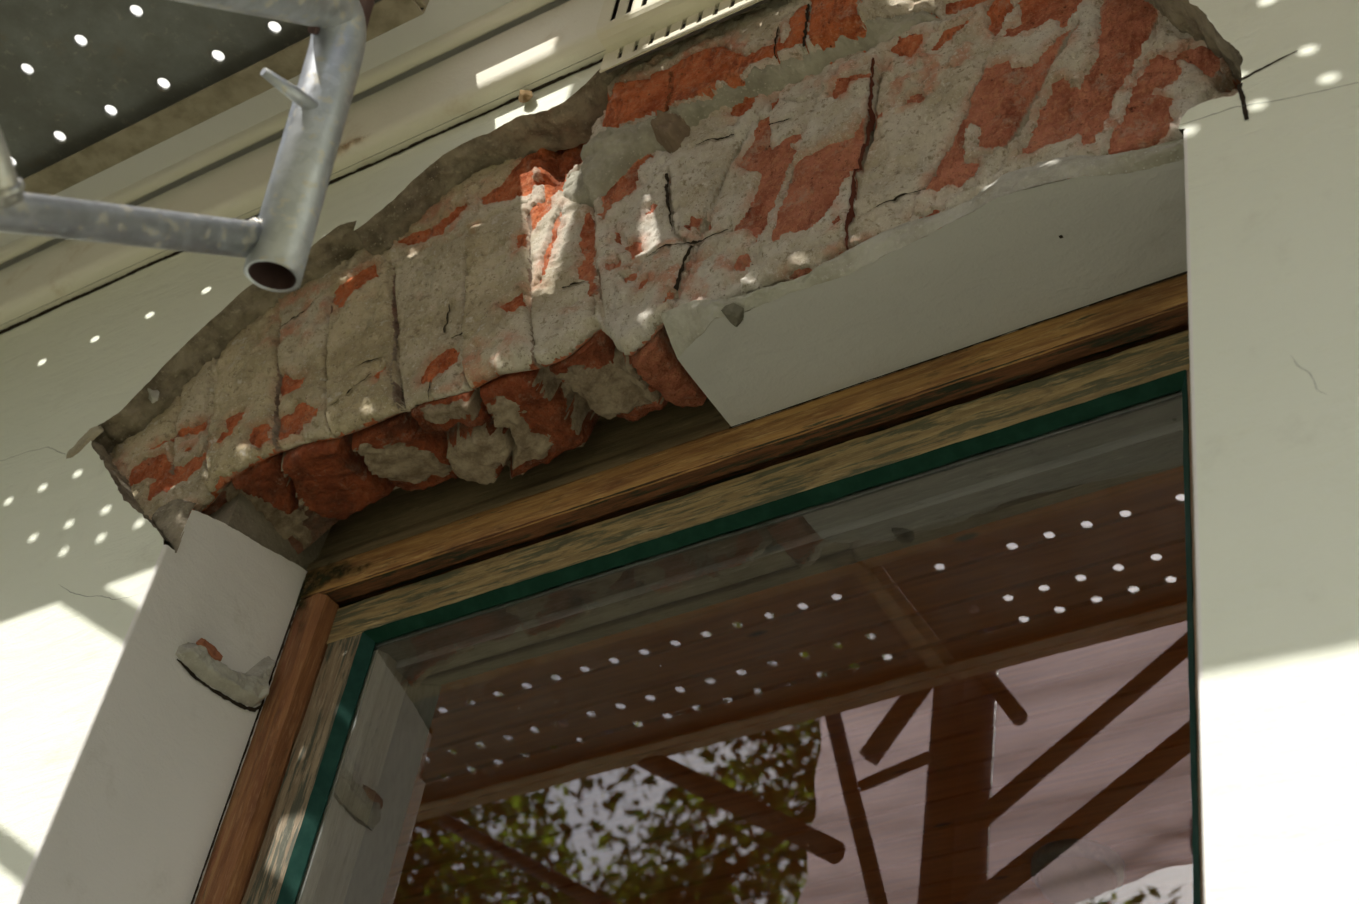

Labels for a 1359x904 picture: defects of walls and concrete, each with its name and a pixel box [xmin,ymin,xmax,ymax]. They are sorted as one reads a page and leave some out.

spalling [66,0,1243,554]
crack [650,173,728,291]
crack [845,57,923,250]
crack [1237,50,1298,120]